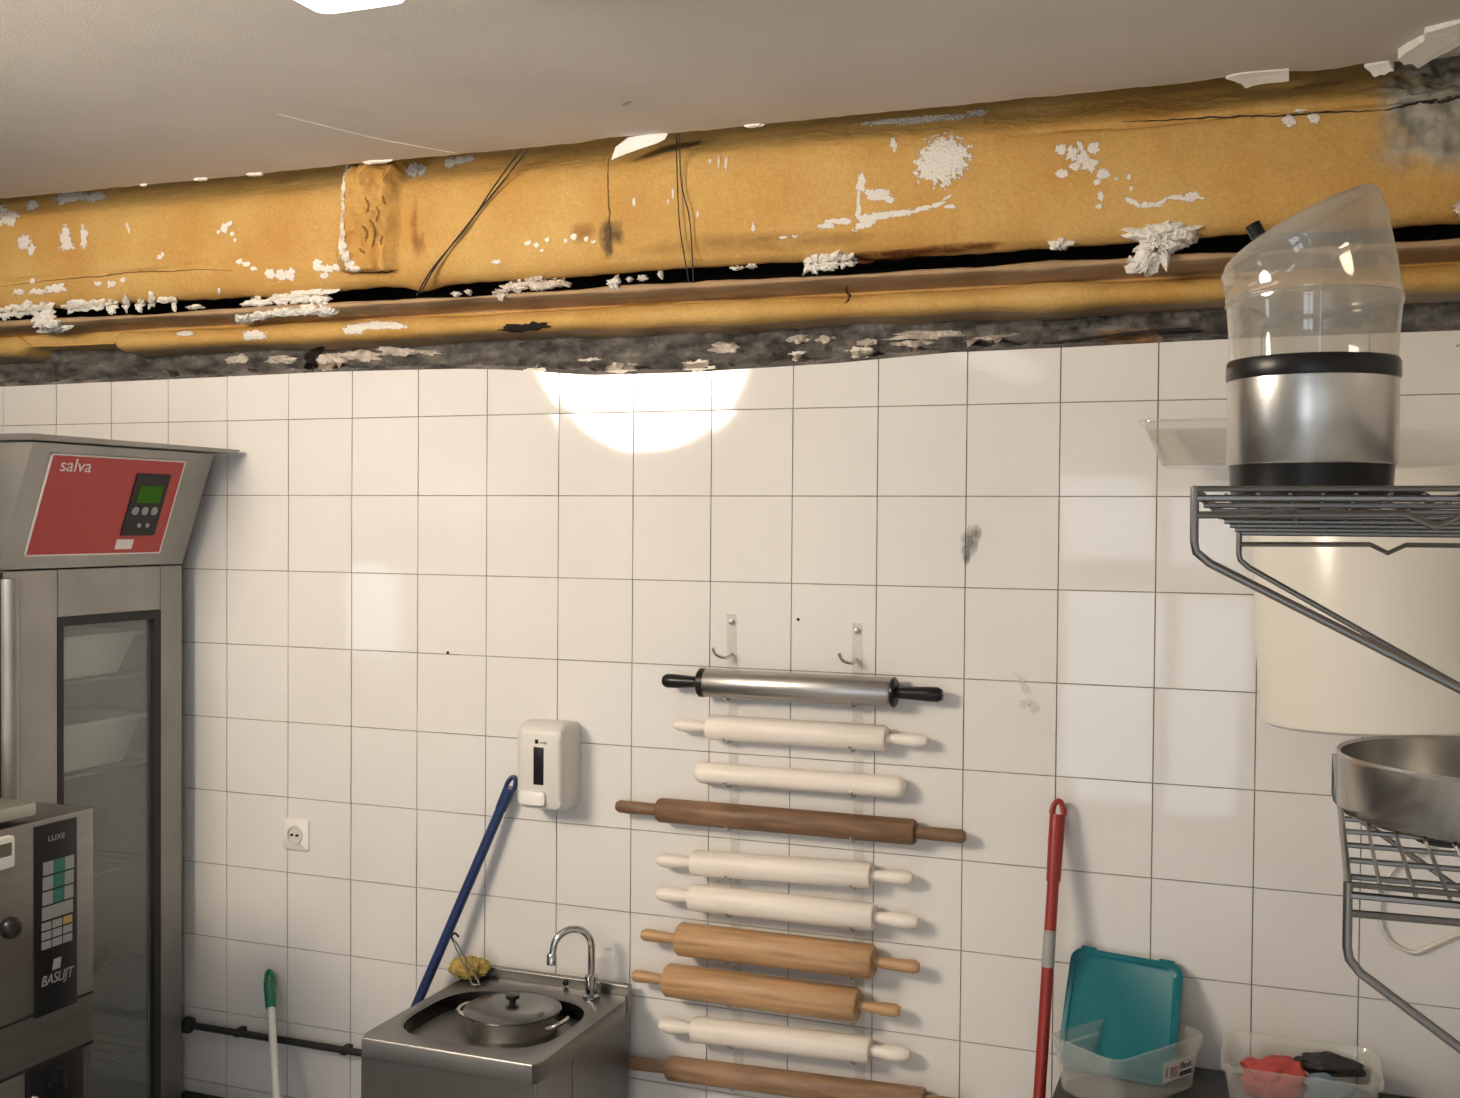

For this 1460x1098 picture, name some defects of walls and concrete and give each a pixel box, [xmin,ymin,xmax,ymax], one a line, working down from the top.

peeling [1226,68,1289,88]
crack [1122,95,1460,122]
peeling [611,133,668,160]
peeling [817,108,988,232]
peeling [1055,141,1205,209]
peeling [0,191,110,256]
spalling [313,154,475,279]
peeling [216,221,295,283]
spalling [225,321,441,373]
spalling [680,341,740,372]
spalling [786,330,1021,362]
damp [1101,331,1150,343]